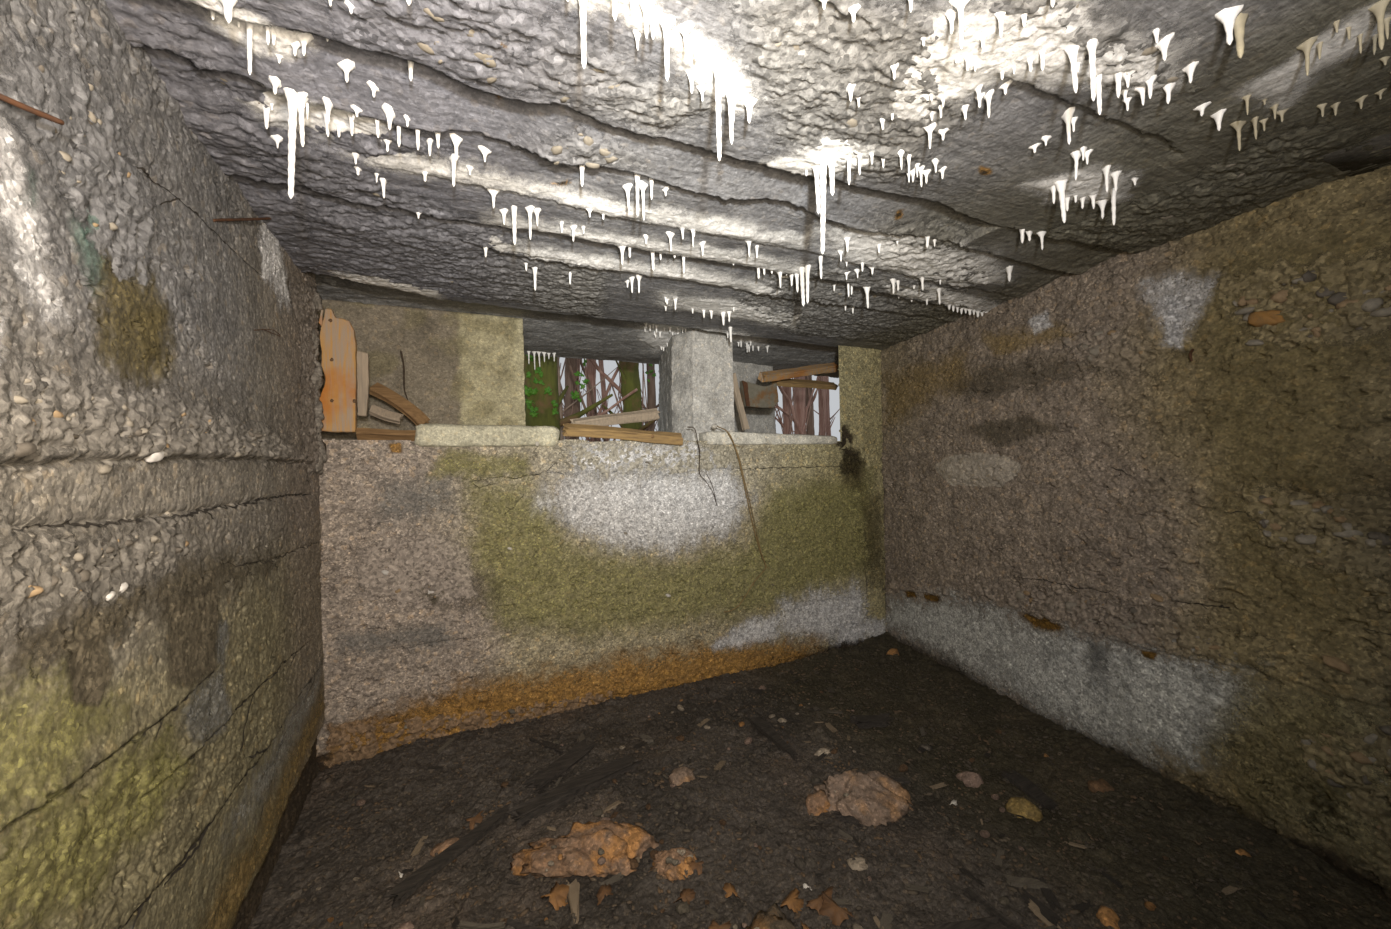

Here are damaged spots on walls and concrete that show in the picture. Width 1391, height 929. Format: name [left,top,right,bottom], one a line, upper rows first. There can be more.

leakage [191,0,311,59]
leakage [888,0,1186,121]
leakage [1240,6,1391,109]
crack [136,167,264,279]
leakage [248,85,1008,353]
leakage [1021,165,1131,203]
leakage [537,442,747,553]
leakage [11,553,273,738]
leakage [0,755,183,906]
crack [0,672,214,832]
crack [118,642,320,929]
leakage [713,587,1391,905]